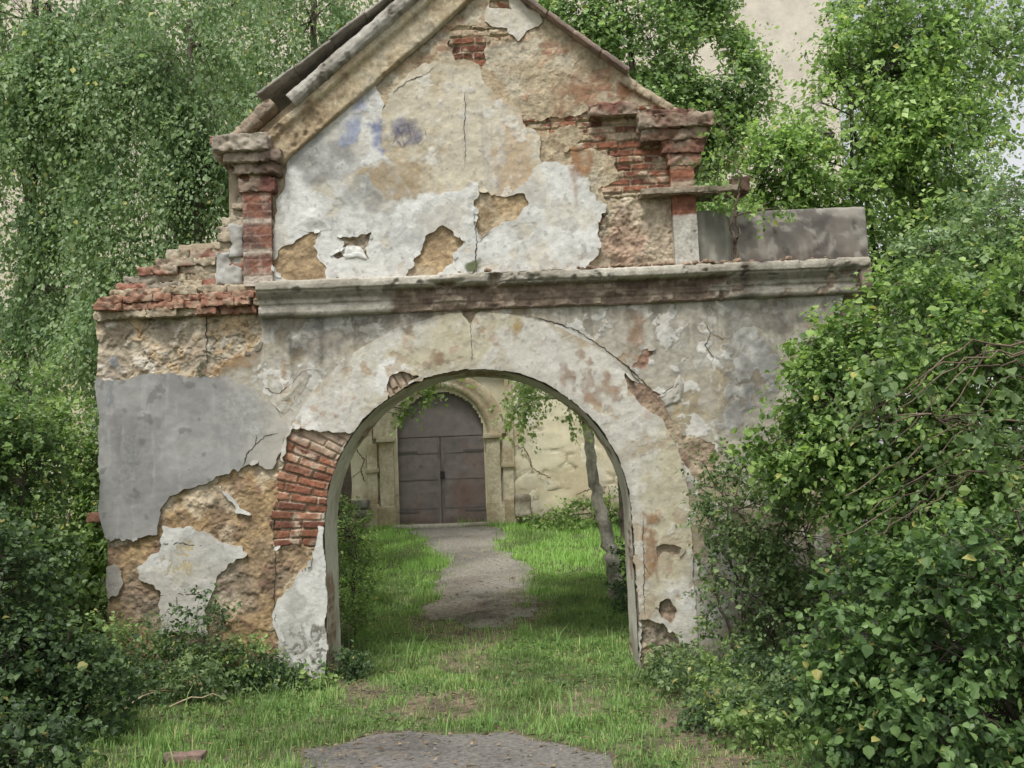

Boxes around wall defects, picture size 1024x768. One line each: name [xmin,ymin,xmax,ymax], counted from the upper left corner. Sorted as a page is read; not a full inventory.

flaking render [104,426,353,679]